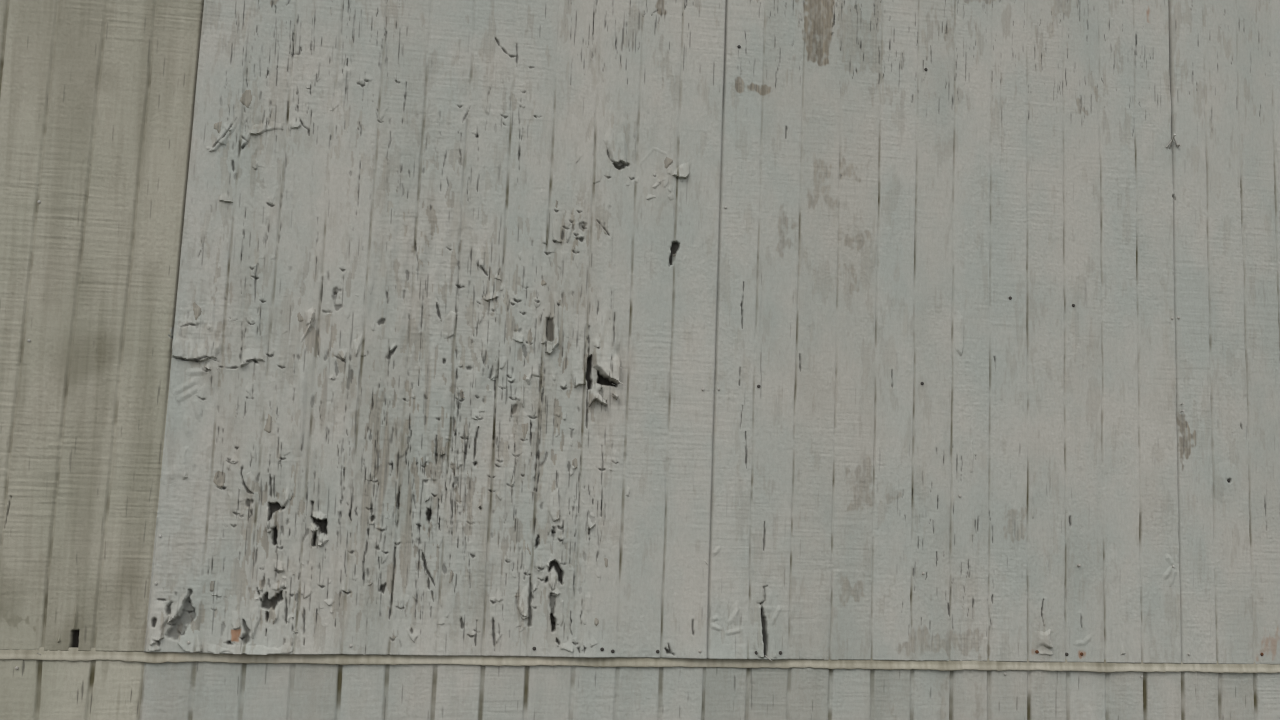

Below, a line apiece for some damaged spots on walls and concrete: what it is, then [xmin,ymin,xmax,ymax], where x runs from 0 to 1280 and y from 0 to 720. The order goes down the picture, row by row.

peeling [206,90,301,170]
crack [224,0,535,216]
crack [564,0,802,89]
peeling [793,0,892,85]
crack [834,0,1154,138]
peeling [540,200,609,269]
peeling [240,264,388,400]
crack [207,192,606,655]
peeling [413,356,568,548]
crack [738,367,748,469]
peeling [467,520,588,644]
crack [901,440,995,637]